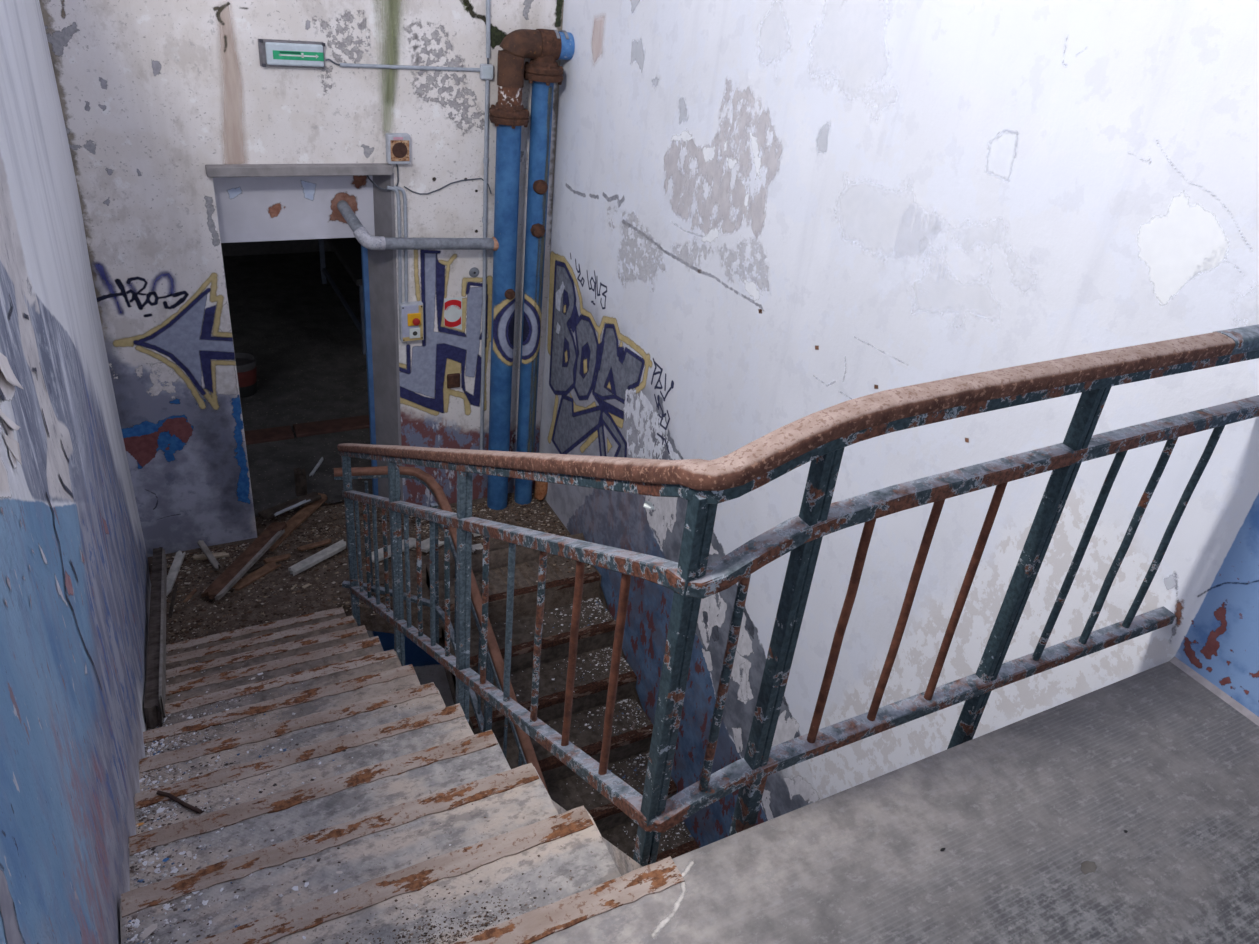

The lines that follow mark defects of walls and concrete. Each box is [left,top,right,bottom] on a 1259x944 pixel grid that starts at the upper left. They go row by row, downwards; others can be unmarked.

corrosion [213,2,248,164]
peeling [305,10,370,92]
water stain [379,0,399,131]
peeling [405,21,485,134]
spalling [608,80,782,301]
peeling [121,362,193,469]
peeling [645,495,678,550]
peeling [697,592,727,671]
peeling [730,607,754,705]
crack [1164,573,1259,642]
peeling [1183,602,1259,695]
peeling [771,696,799,747]